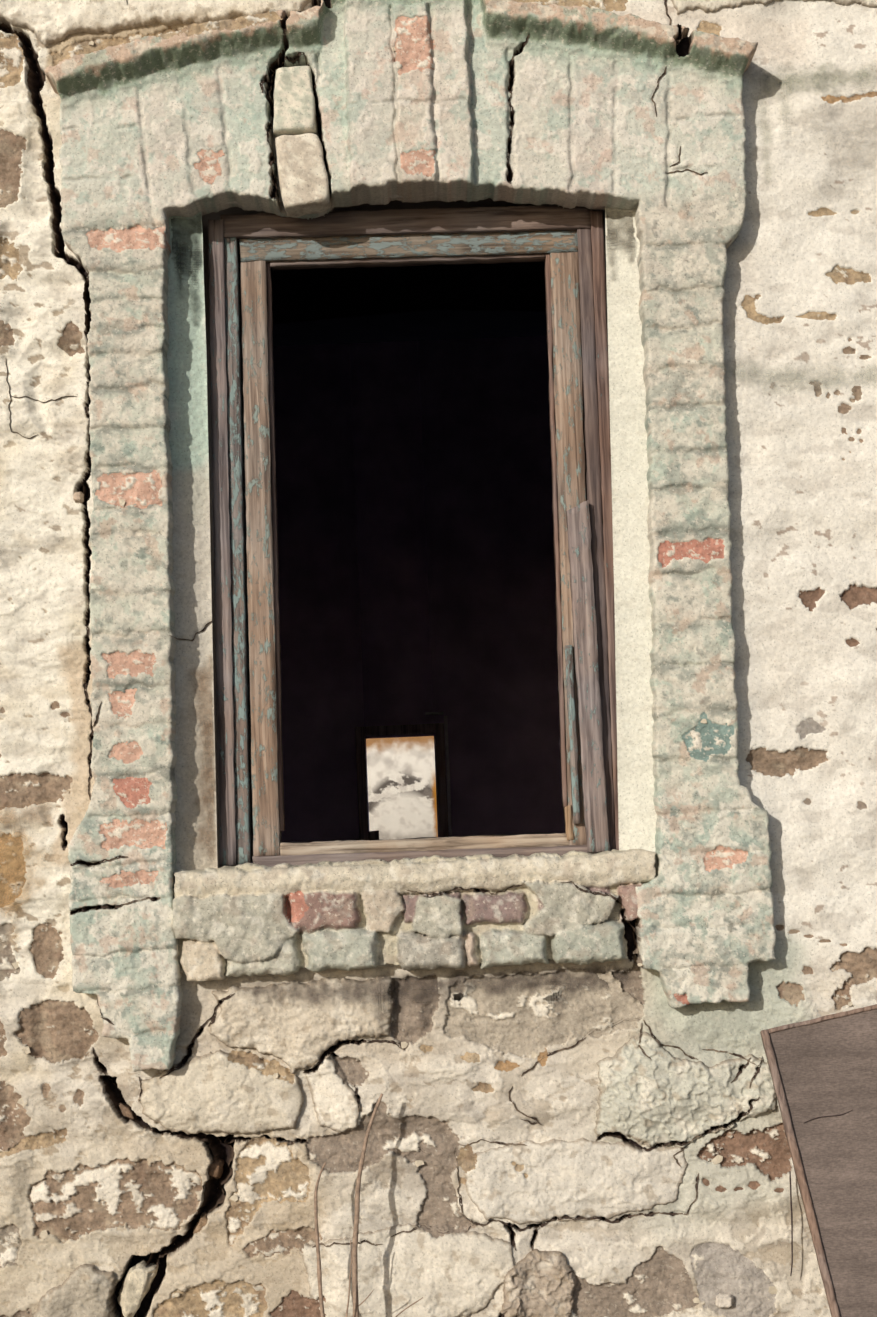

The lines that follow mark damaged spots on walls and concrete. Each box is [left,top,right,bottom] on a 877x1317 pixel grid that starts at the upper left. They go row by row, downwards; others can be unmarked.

crack [259,0,331,199]
crack [506,35,529,183]
peeling [741,294,837,325]
peeling [825,265,871,285]
crack [0,23,128,866]
peeling [798,584,877,612]
peeling [682,712,734,762]
peeling [746,717,828,777]
crack [70,897,160,915]
peeling [775,925,877,1010]
crack [92,993,312,1317]
crack [303,1018,763,1250]